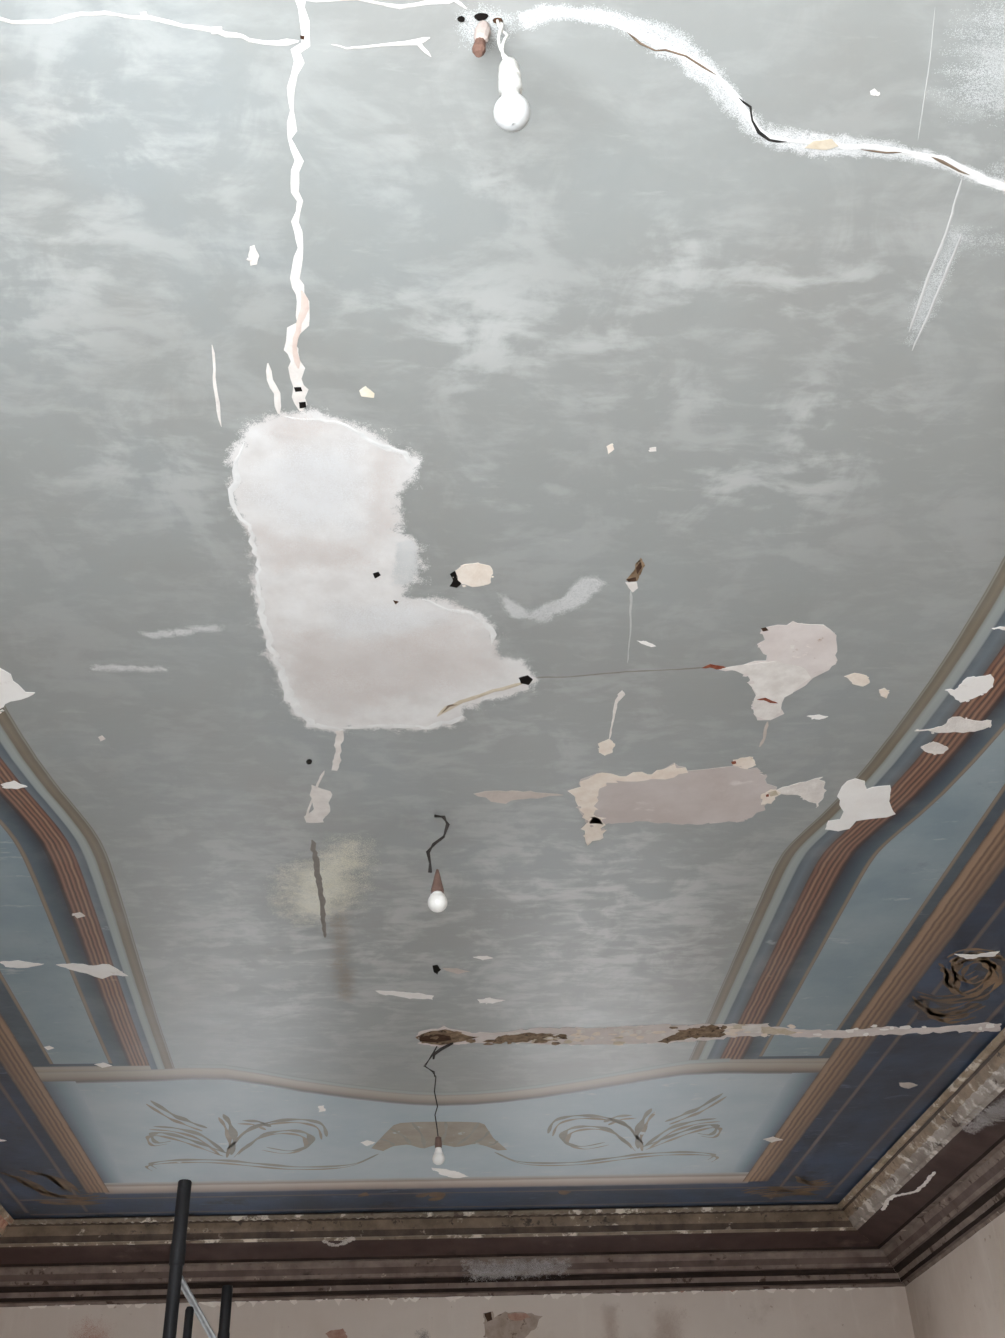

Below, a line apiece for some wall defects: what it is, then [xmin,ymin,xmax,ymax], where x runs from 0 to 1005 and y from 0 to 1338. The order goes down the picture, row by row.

crack [516,3,1005,194]
crack [0,0,467,414]
flaking render [450,563,494,588]
flaking render [0,668,35,713]
flaking render [916,674,994,755]
peeling [475,790,561,804]
flaking render [759,772,895,831]
crack [416,1023,1005,1047]
flaking render [316,1257,573,1338]